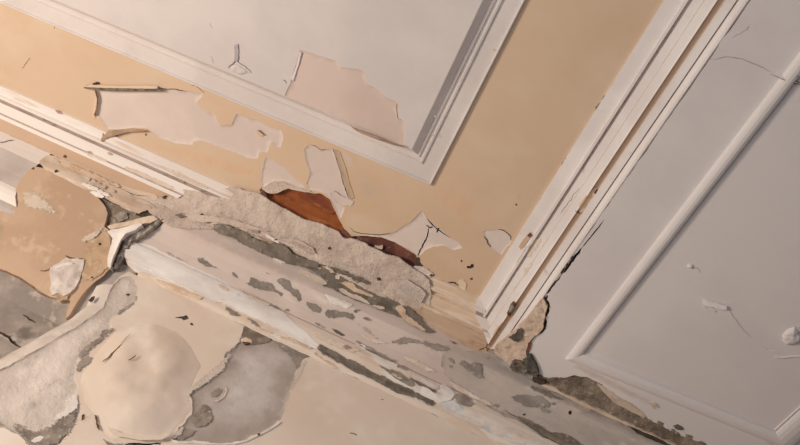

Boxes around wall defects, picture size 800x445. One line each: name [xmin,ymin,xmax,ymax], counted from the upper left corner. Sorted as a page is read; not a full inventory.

peeling [284,50,405,148]
crack [714,56,800,84]
spalling [0,82,707,445]
crack [0,331,21,348]